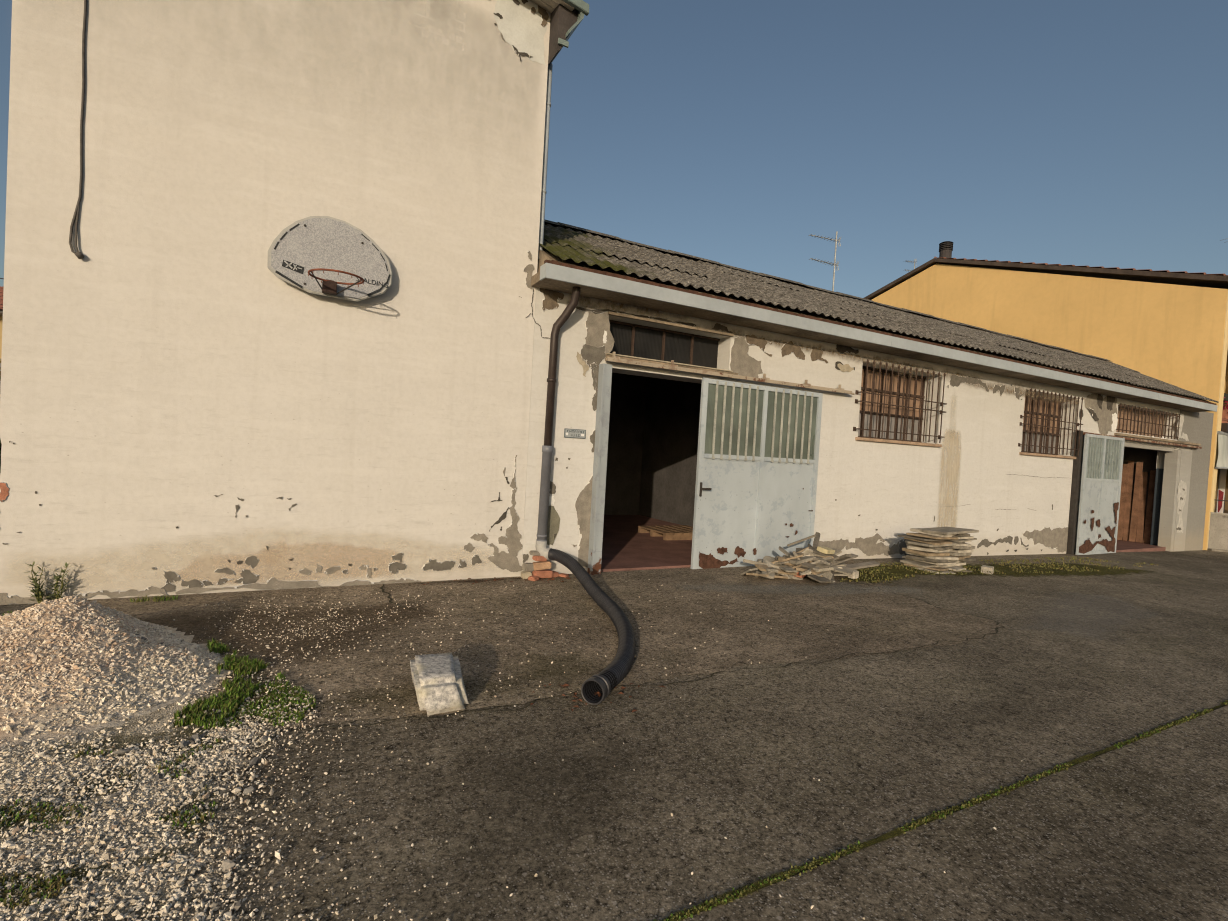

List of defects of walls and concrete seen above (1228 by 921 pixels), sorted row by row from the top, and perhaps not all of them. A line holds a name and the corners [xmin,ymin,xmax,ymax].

peeling [489,0,549,66]
flaking render [523,251,564,312]
flaking render [576,306,859,411]
spalling [0,482,9,502]
flaking render [573,475,593,568]
corrosion [699,546,757,569]
flaking render [813,529,910,557]
flaking render [976,527,1068,555]
corrosion [1079,502,1119,554]
flaking render [0,590,55,605]
flaking render [77,455,580,747]